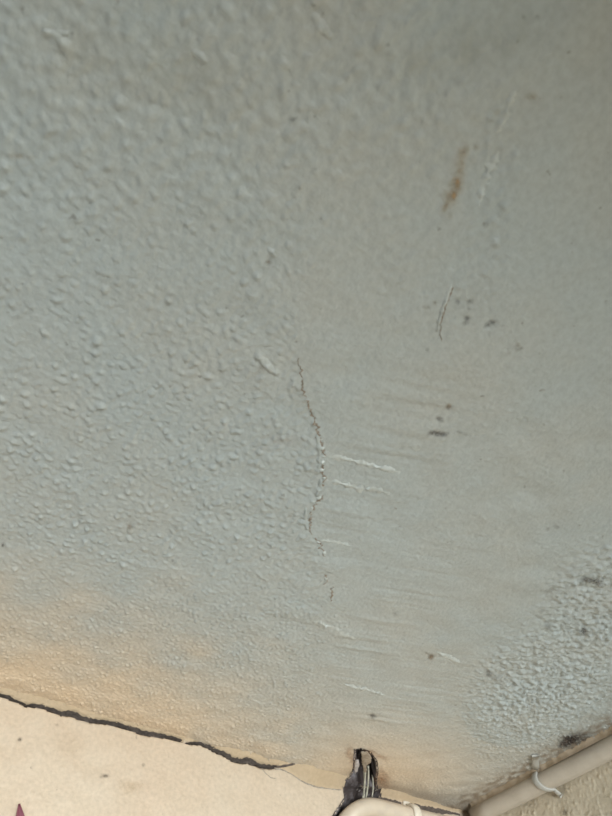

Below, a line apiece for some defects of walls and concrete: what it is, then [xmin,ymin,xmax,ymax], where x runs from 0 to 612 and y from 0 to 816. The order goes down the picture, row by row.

crack [297,358,334,601]
crack [0,694,346,790]
spalling [332,748,382,816]